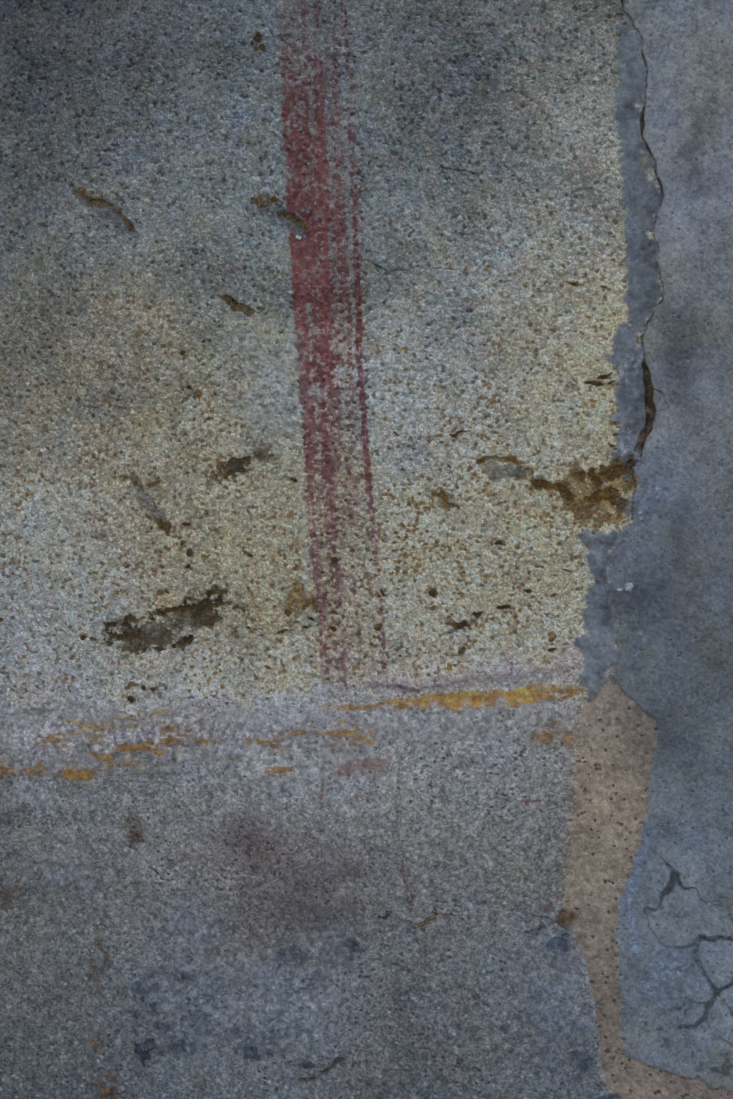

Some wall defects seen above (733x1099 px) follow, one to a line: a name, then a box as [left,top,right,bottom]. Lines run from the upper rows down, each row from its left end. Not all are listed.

crack [621,0,663,221]
spalling [529,433,639,531]
crack [622,281,664,513]
spalling [80,585,245,658]
crack [643,859,733,1057]